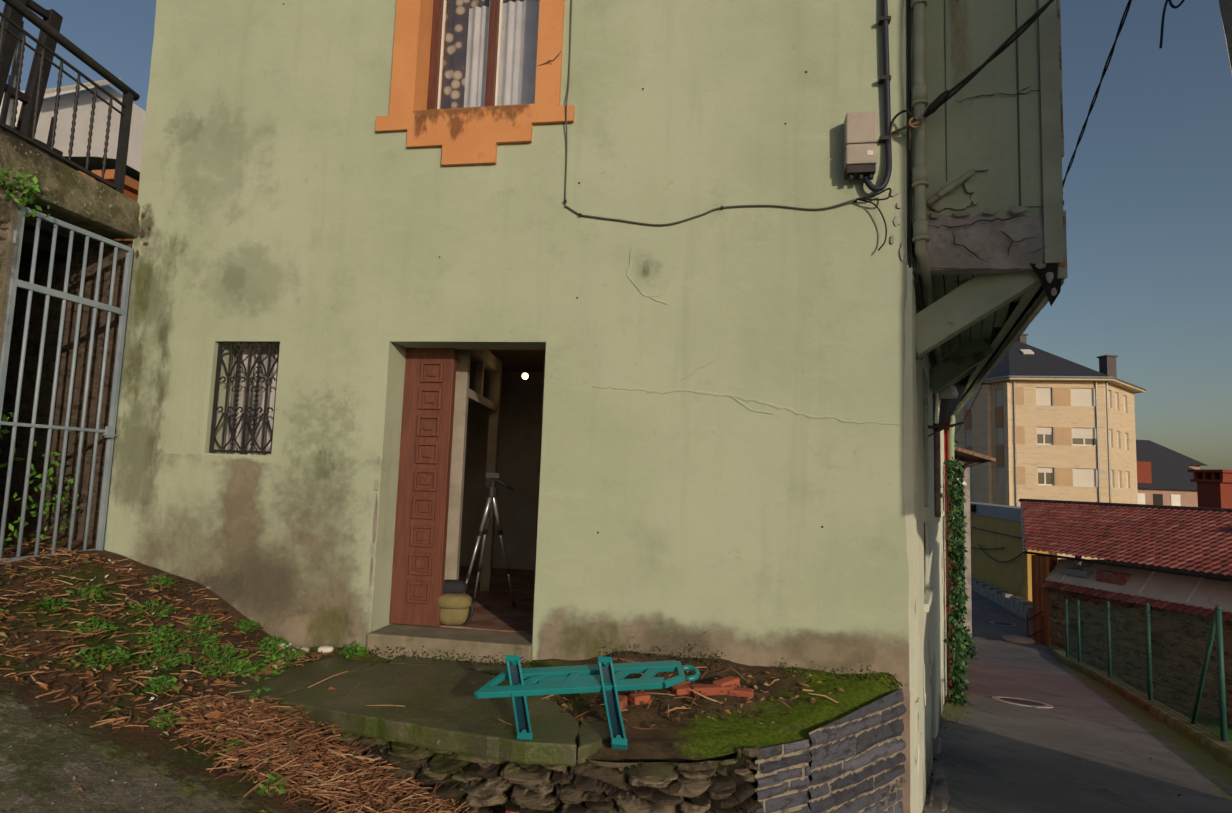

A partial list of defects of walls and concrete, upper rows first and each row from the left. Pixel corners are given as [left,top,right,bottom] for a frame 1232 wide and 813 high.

spalling [890,166,1066,306]
leakage [138,459,352,647]
leakage [538,612,910,693]